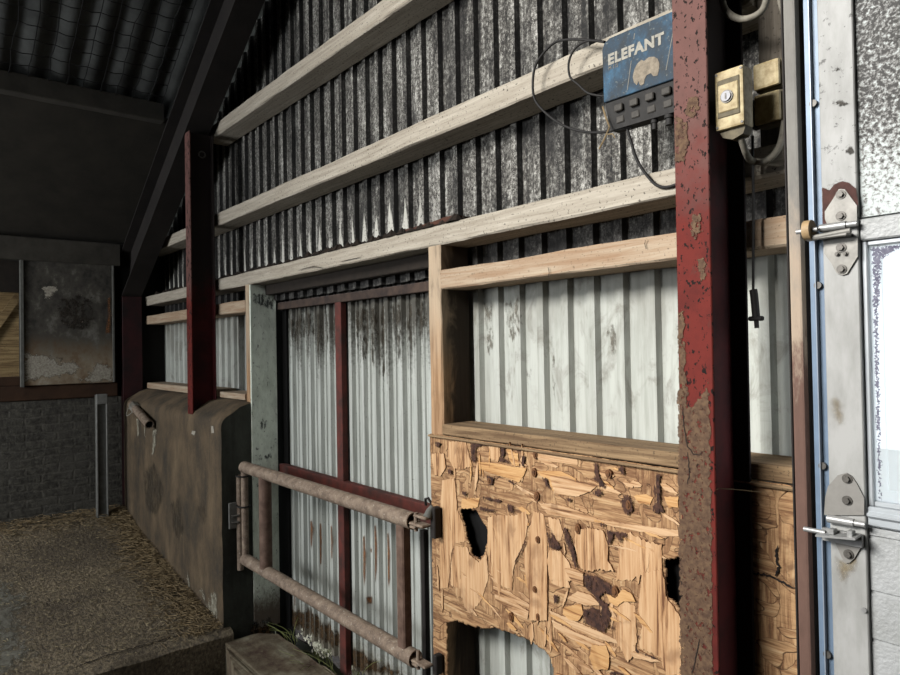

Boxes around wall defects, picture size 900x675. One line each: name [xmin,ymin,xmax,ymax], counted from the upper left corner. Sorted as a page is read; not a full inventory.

peeling [674,96,700,162]
corrosion [822,181,858,224]
damp [290,314,335,354]
damp [356,301,427,376]
peeling [432,311,713,675]
corrosion [310,521,333,564]
corrosion [363,526,390,584]